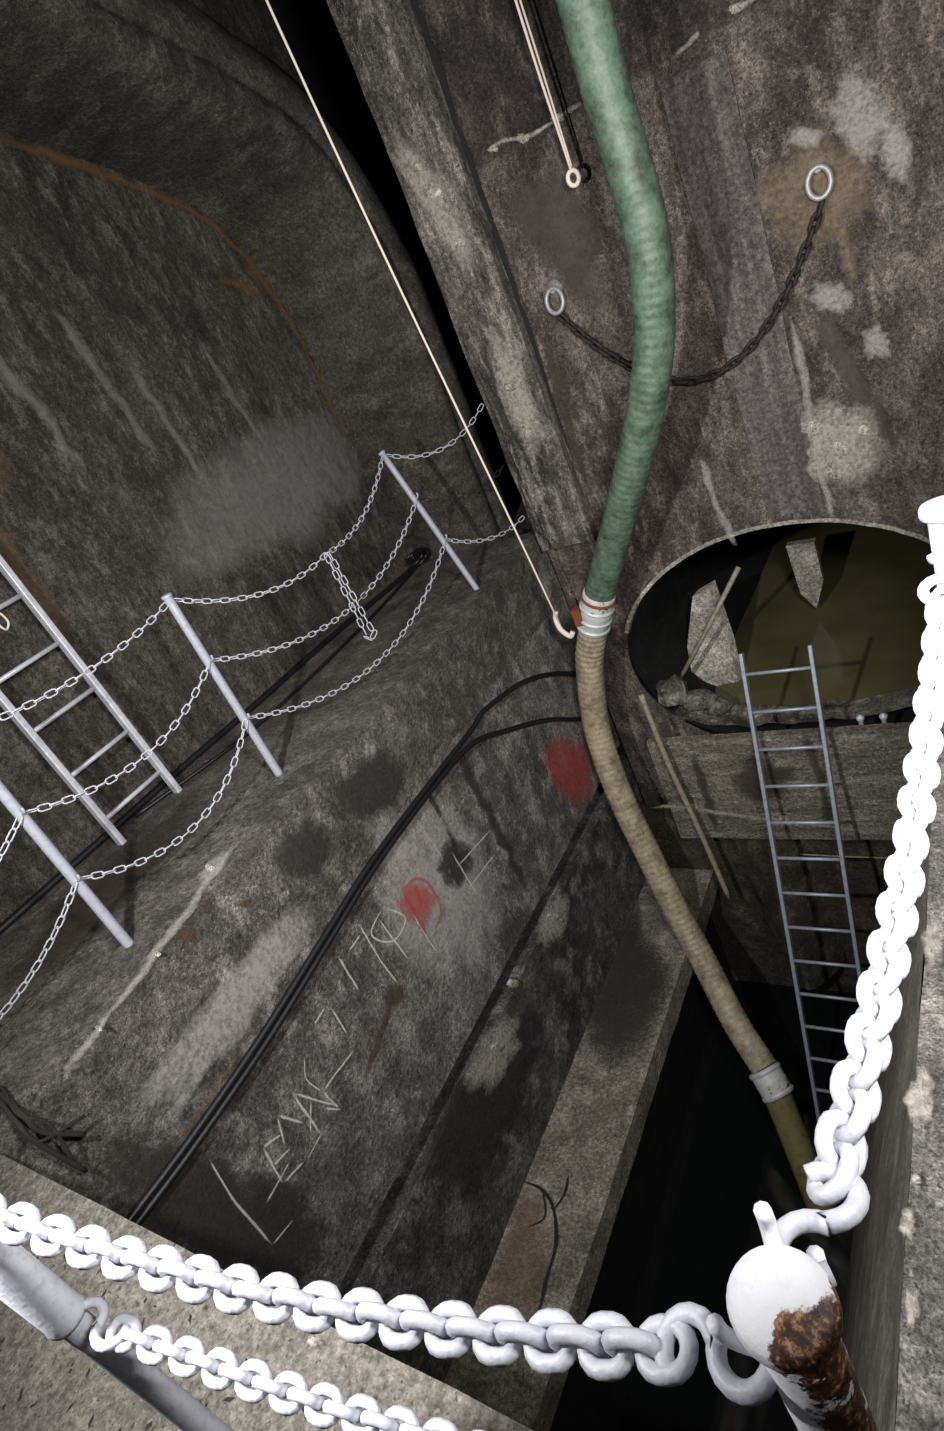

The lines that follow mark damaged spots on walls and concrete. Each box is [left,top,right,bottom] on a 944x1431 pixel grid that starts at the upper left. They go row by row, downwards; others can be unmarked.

corrosion [764,141,861,276]